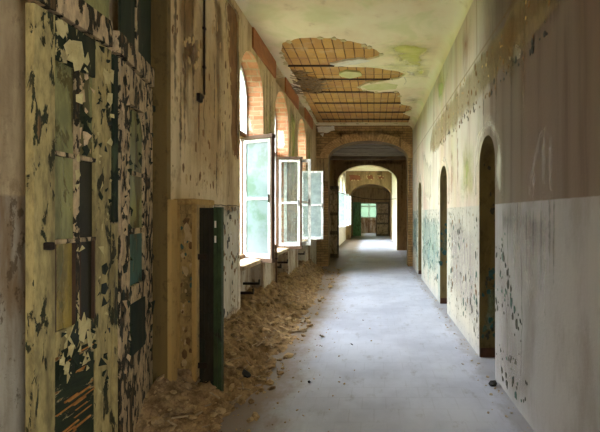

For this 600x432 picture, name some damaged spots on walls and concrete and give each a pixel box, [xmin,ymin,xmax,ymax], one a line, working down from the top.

peeling [55,20,114,189]
peeling [121,73,155,236]
damp [174,0,194,149]
spalling [279,36,412,124]
peeling [434,31,548,150]
peeling [58,293,109,394]
peeling [97,263,110,315]
peeling [224,207,239,318]
peeling [413,214,522,342]
peeling [496,344,528,403]